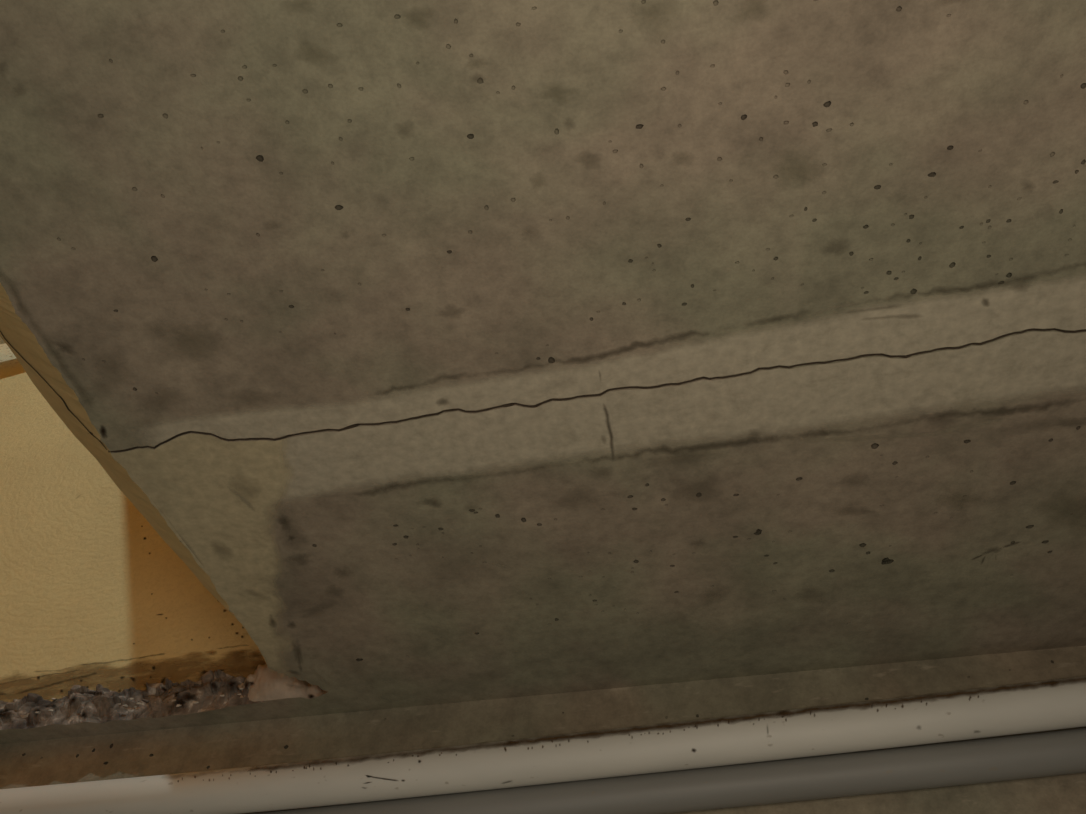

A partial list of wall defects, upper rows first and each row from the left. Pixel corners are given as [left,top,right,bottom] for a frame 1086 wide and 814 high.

crack [0,328,1086,453]
spalling [0,664,327,730]